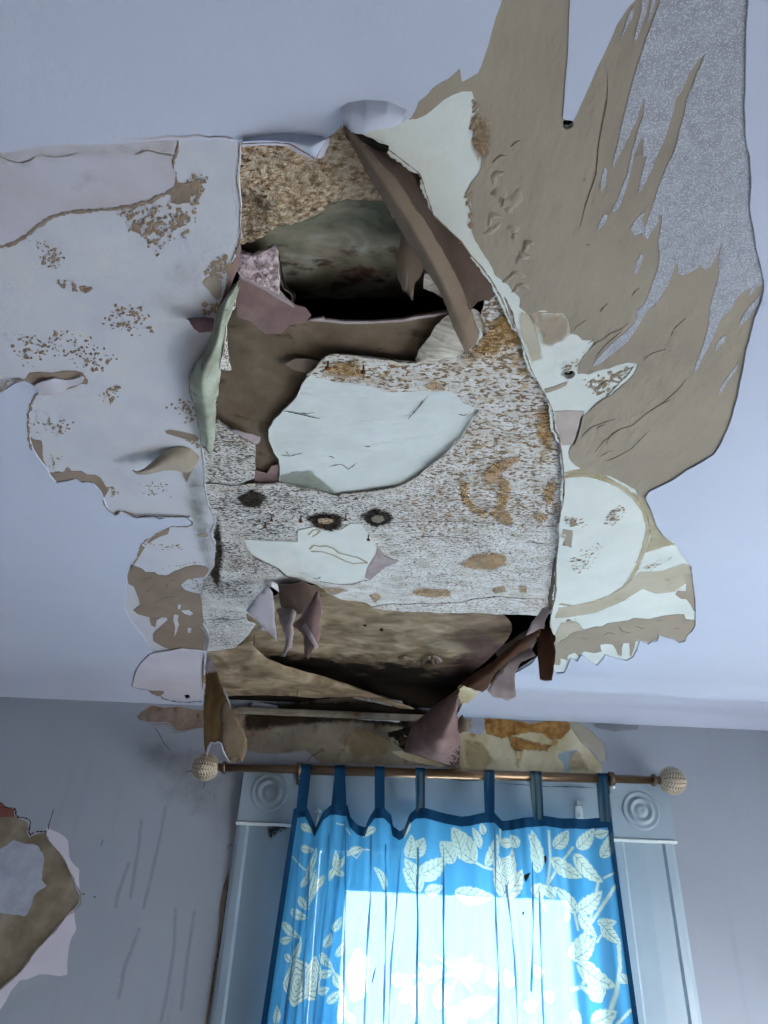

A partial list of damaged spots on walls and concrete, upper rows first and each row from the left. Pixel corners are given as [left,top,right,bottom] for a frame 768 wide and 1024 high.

peeling [363,0,764,673]
flaking render [0,134,243,703]
damp [361,510,394,528]
rust [460,457,519,526]
rust [534,480,555,522]
rust [461,553,506,570]
damp [245,700,428,730]
flaking render [246,685,602,774]
flaking render [0,802,81,1009]